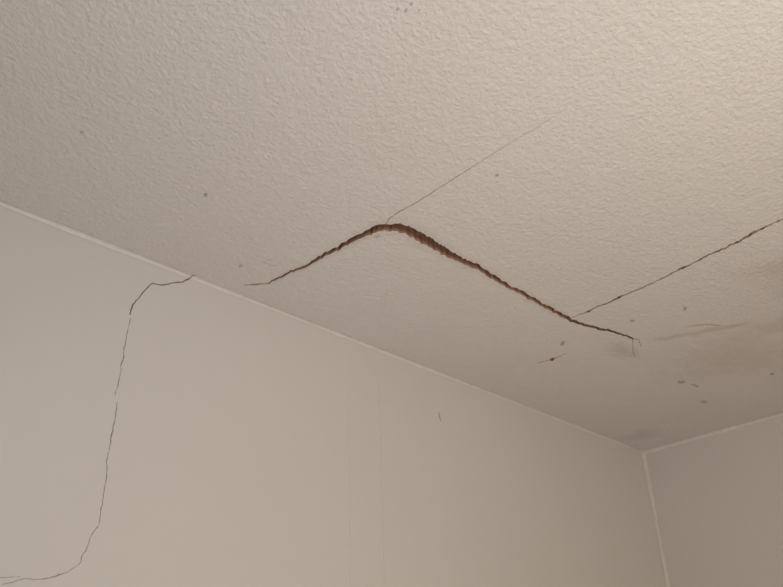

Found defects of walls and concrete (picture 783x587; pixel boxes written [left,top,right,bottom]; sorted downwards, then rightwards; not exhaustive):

crack [243,108,783,339]
crack [0,275,195,584]